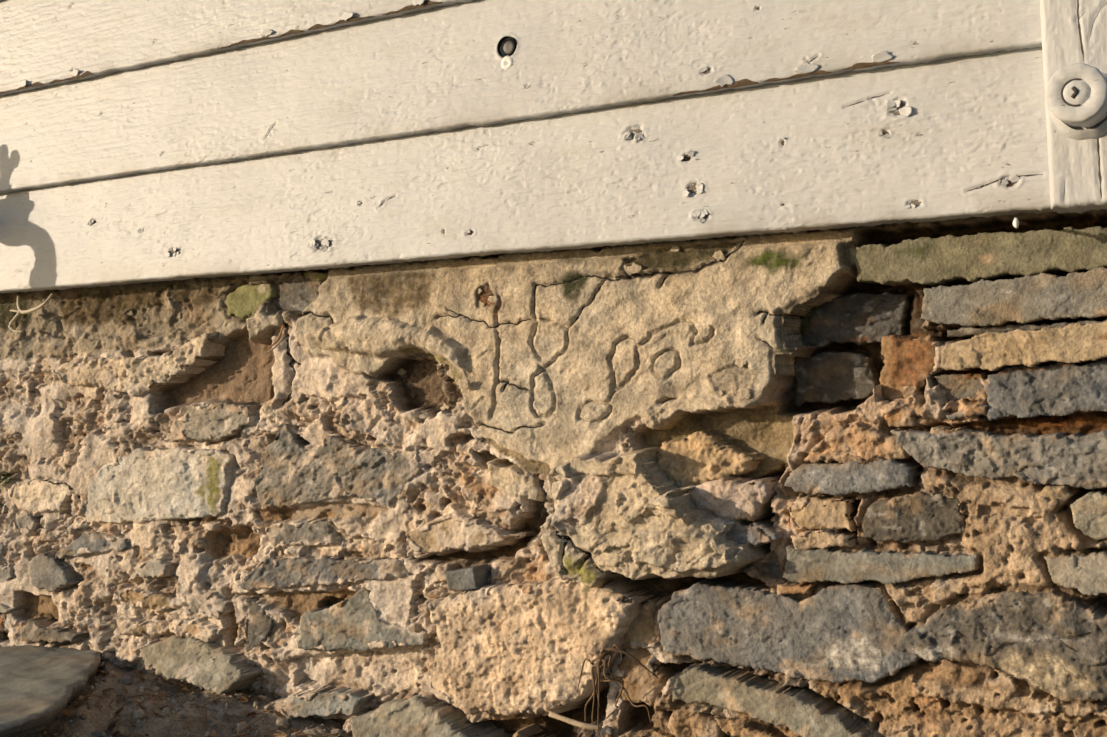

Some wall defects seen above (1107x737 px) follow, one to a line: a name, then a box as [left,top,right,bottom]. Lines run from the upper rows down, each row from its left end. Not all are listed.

peeling [673,51,900,96]
peeling [886,99,912,117]
peeling [622,128,644,141]
peeling [678,150,695,161]
peeling [1000,174,1020,188]
peeling [683,182,703,197]
peeling [693,209,708,223]
peeling [309,239,331,252]
crack [439,240,744,328]